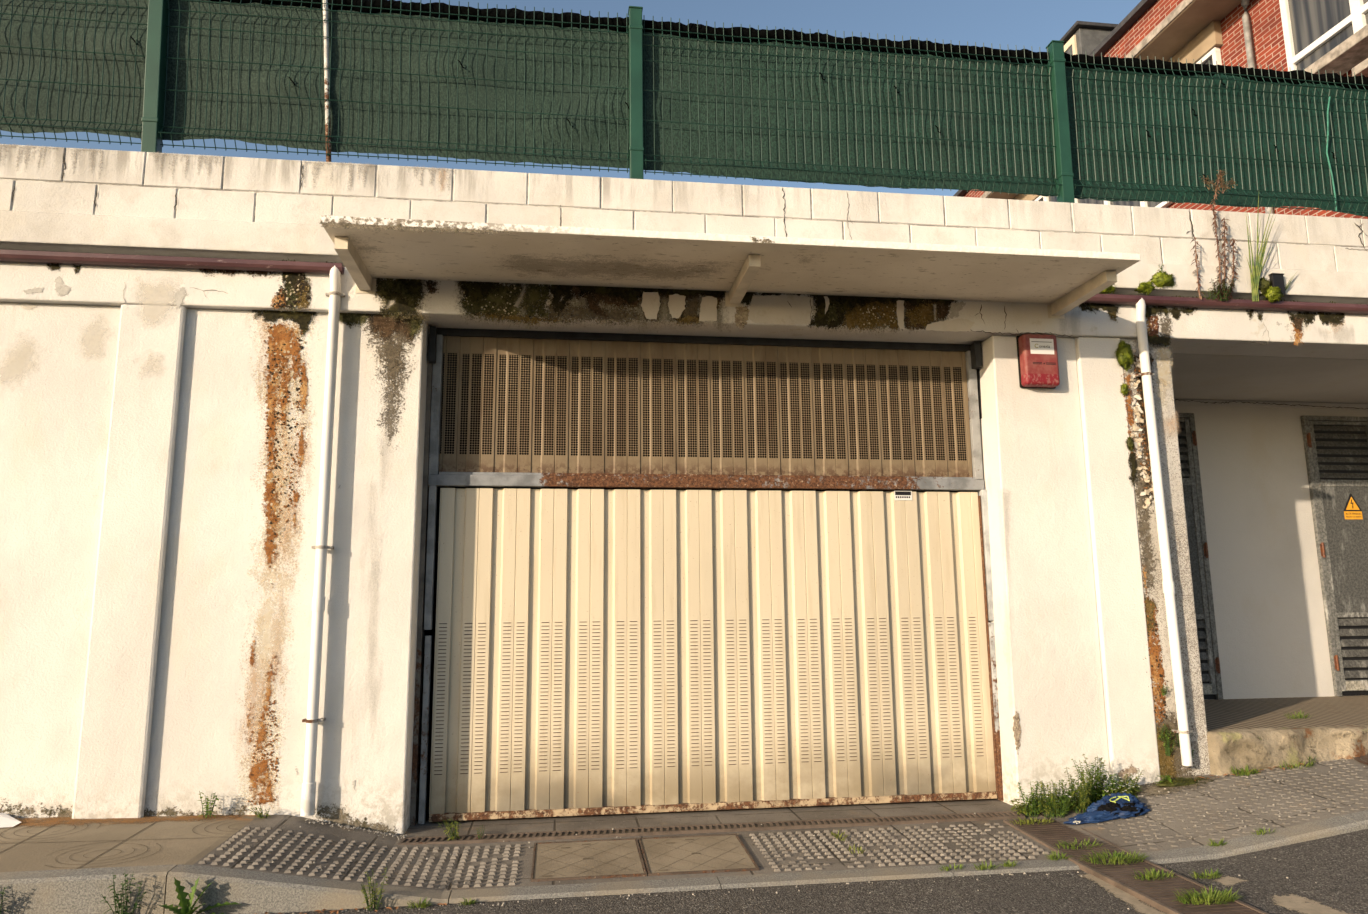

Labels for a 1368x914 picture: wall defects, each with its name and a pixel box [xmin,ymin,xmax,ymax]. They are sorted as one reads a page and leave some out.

leakage [362,278,429,456]
leakage [455,281,726,328]
leakage [759,293,957,333]
crack [1345,222,1368,251]
corrosion [261,323,309,588]
corrosion [244,637,279,805]
corrosion [1142,564,1172,726]